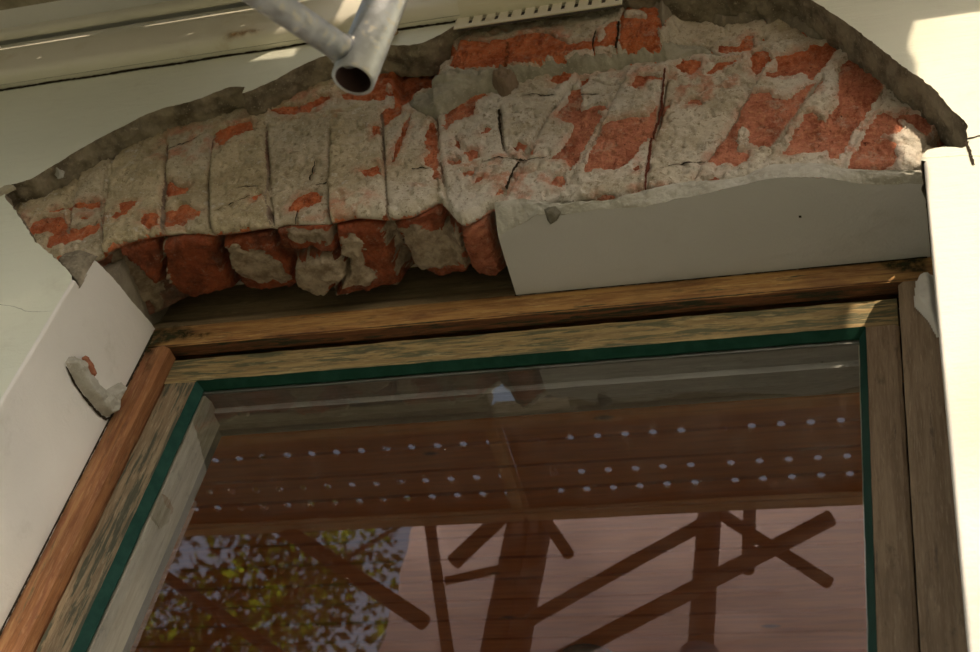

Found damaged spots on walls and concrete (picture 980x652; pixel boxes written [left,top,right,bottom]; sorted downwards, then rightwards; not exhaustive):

flaking render [0,0,968,315]
crack [483,109,544,189]
crack [644,68,702,190]
crack [965,135,980,165]